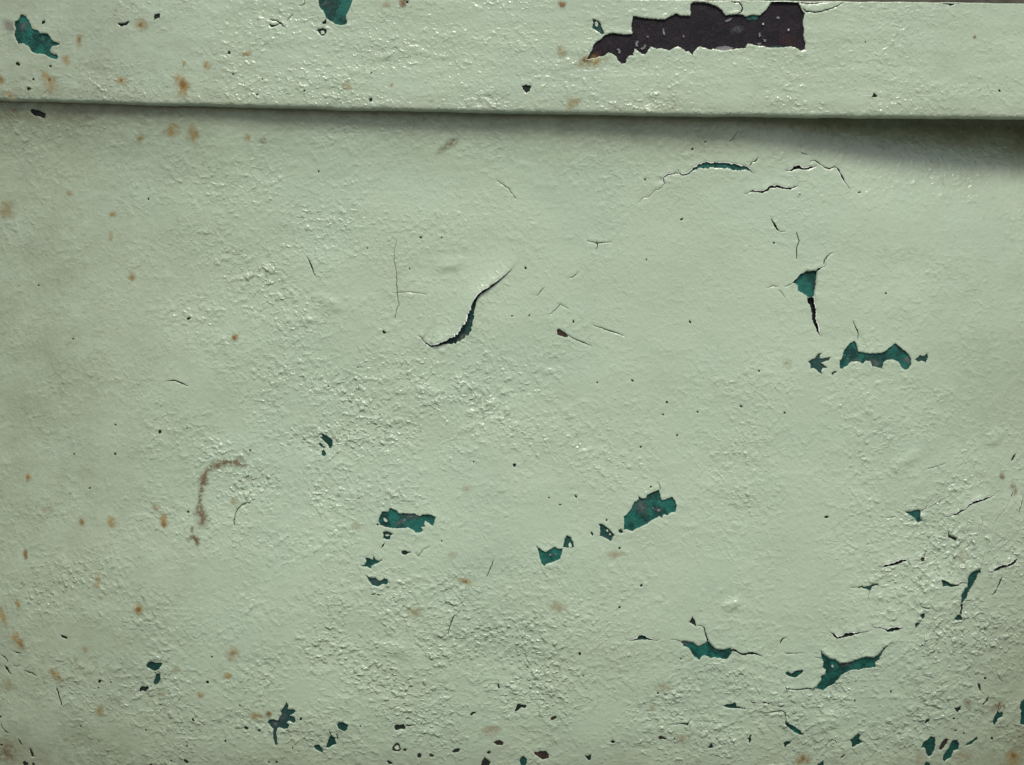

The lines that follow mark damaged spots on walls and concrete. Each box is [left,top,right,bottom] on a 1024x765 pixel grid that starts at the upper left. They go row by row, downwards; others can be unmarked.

peeling [14,14,60,67]
peeling [317,0,353,36]
peeling [586,0,841,64]
crack [640,131,850,202]
peeling [769,253,833,336]
peeling [808,321,928,375]
peeling [591,481,677,549]
peeling [361,508,436,596]
peeling [536,535,574,567]
peeling [672,617,761,660]
peeling [785,643,892,691]
peeling [244,703,302,746]